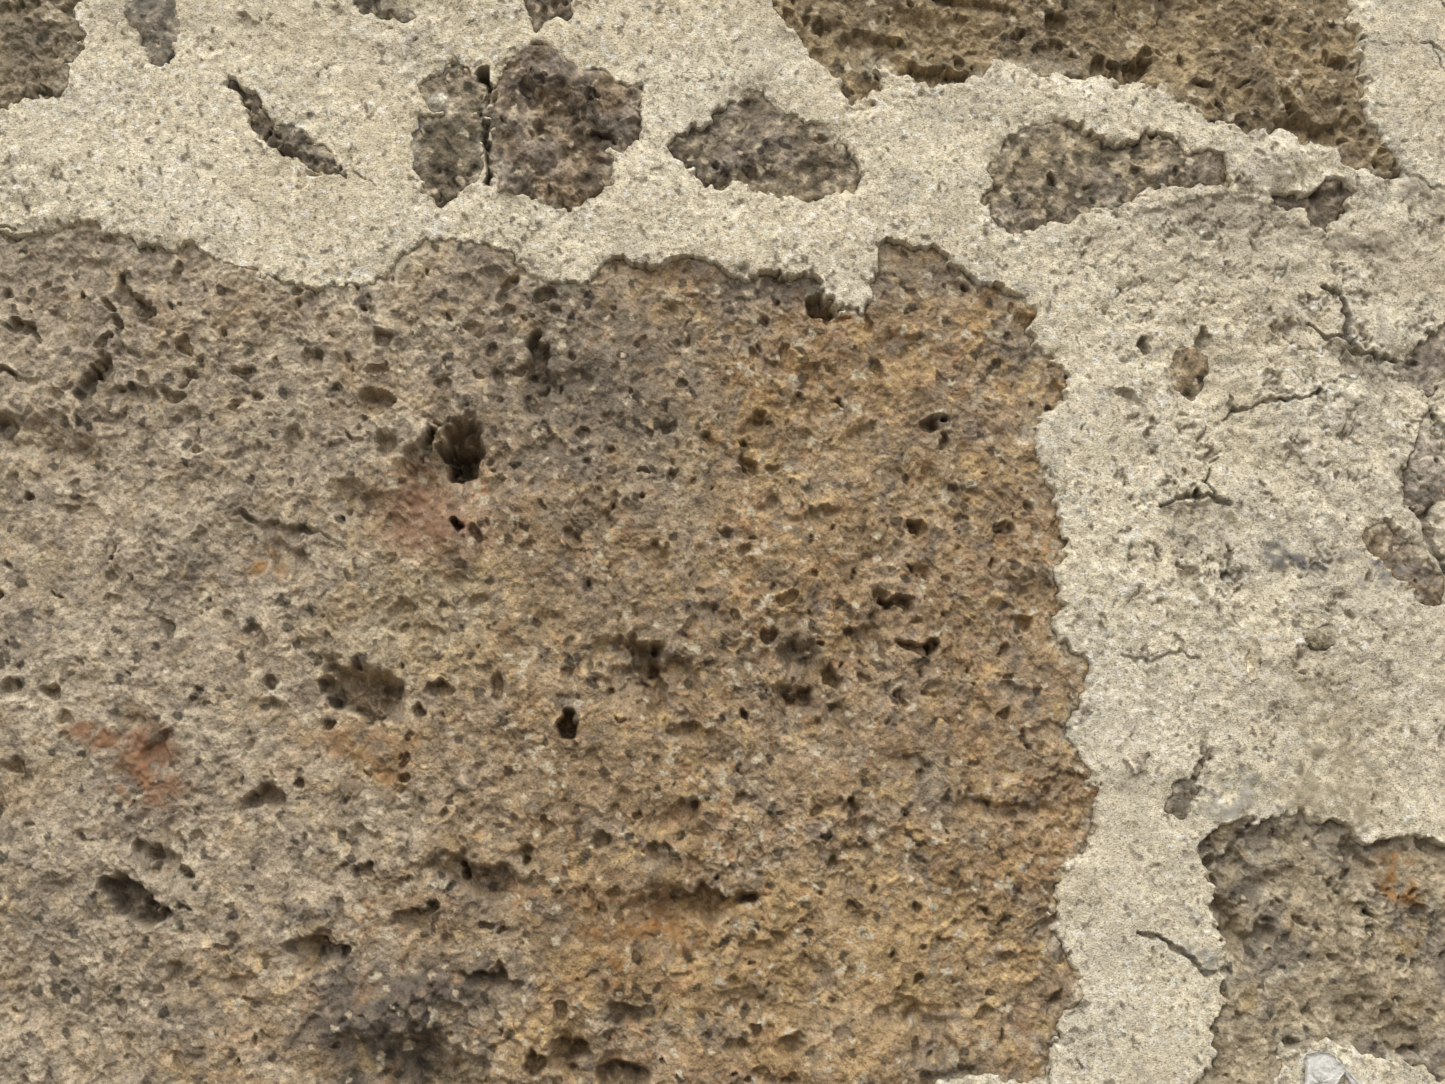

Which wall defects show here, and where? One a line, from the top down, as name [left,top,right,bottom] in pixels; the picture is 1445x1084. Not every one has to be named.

spalling [1120,56,1155,85]
crack [1369,41,1445,70]
crack [1399,163,1445,191]
spalling [114,270,161,331]
crack [1307,284,1404,366]
crack [1222,389,1322,423]
crack [1427,404,1445,440]
spalling [411,678,458,728]
peeling [624,625,719,755]
spalling [278,933,355,971]
spalling [538,1028,653,1084]
peeling [1275,1050,1362,1084]